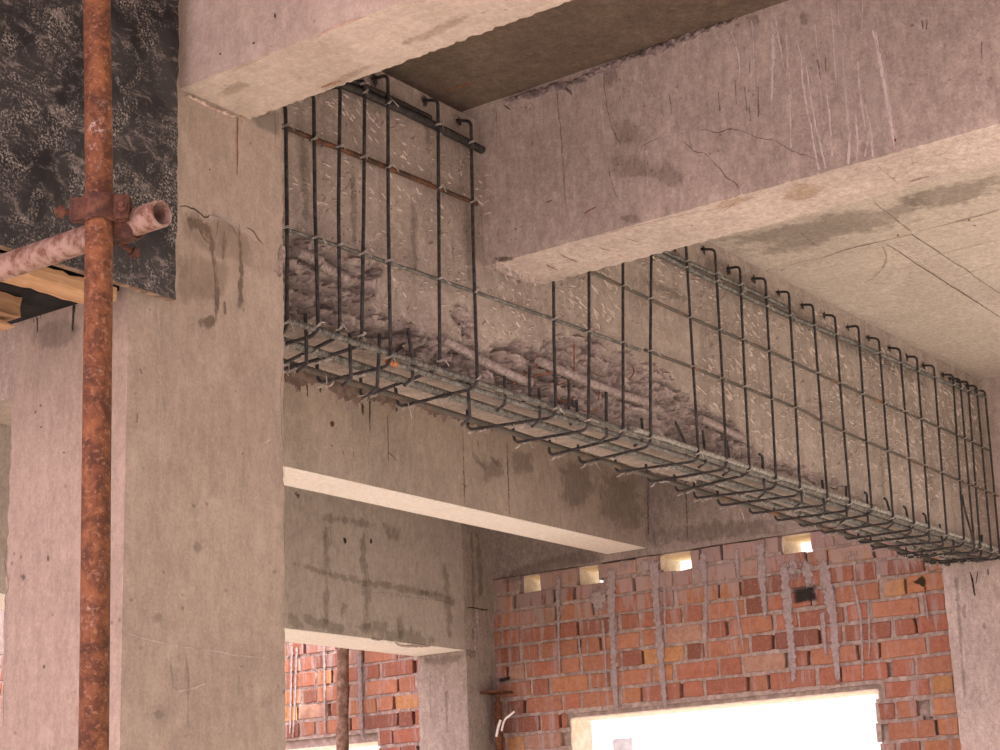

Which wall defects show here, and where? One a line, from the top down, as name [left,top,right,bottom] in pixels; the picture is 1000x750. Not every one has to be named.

peeling [520,72,594,100]
crack [646,128,817,188]
crack [180,205,264,245]
leakage [188,217,226,329]
spalling [274,235,758,463]